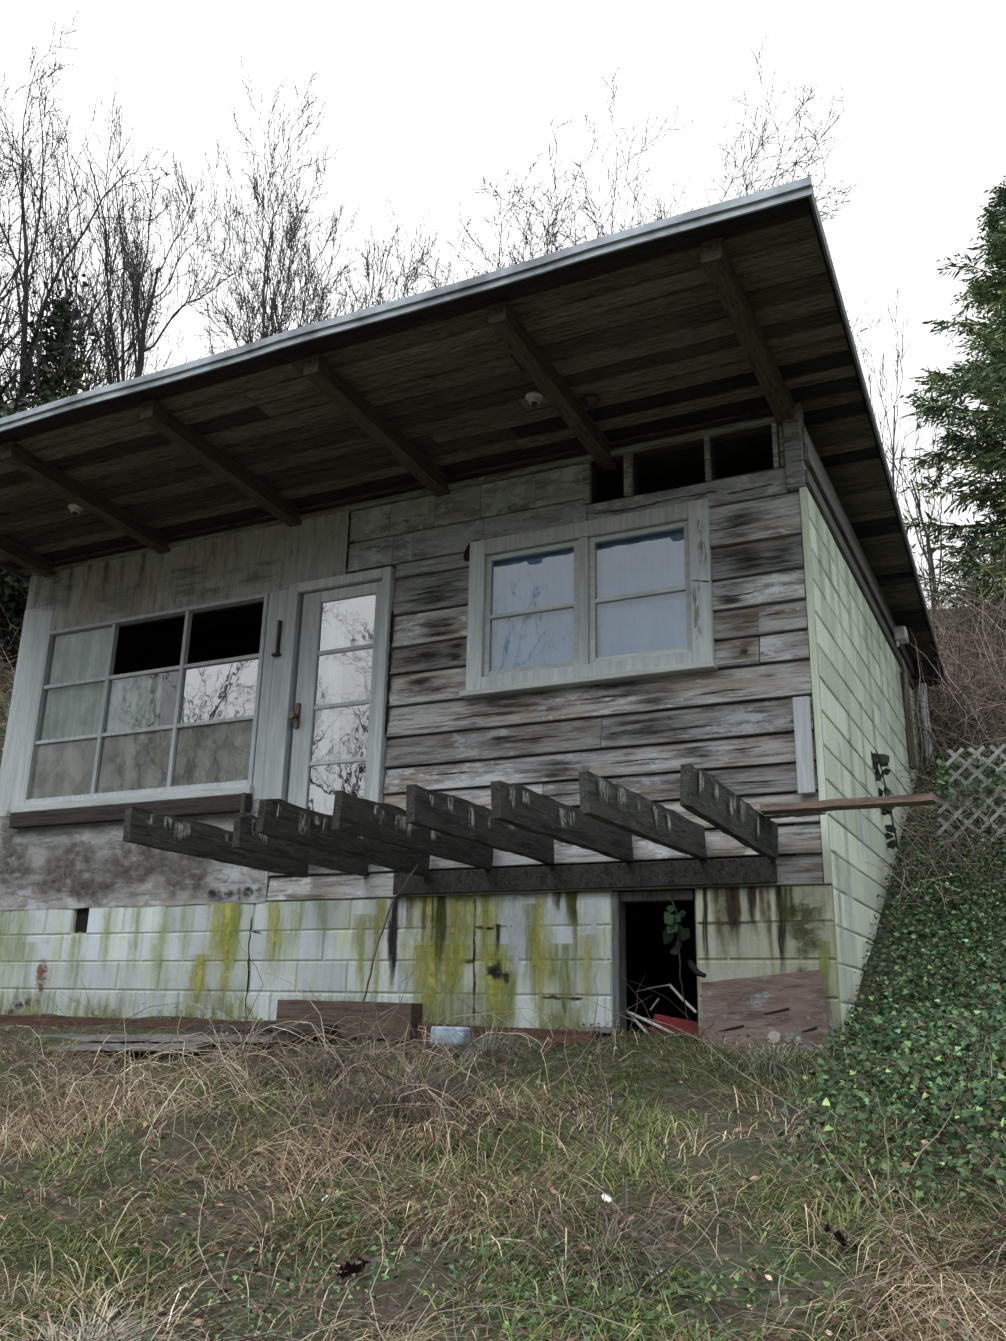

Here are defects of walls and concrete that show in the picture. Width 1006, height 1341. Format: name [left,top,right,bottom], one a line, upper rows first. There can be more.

leakage [719,512,790,570]
leakage [407,582,463,695]
leakage [483,693,558,716]
leakage [597,681,676,740]
leakage [492,735,538,748]
leakage [523,759,571,778]
leakage [190,954,204,1003]
leakage [208,887,298,991]
leakage [356,895,517,1027]
leakage [532,892,594,1030]